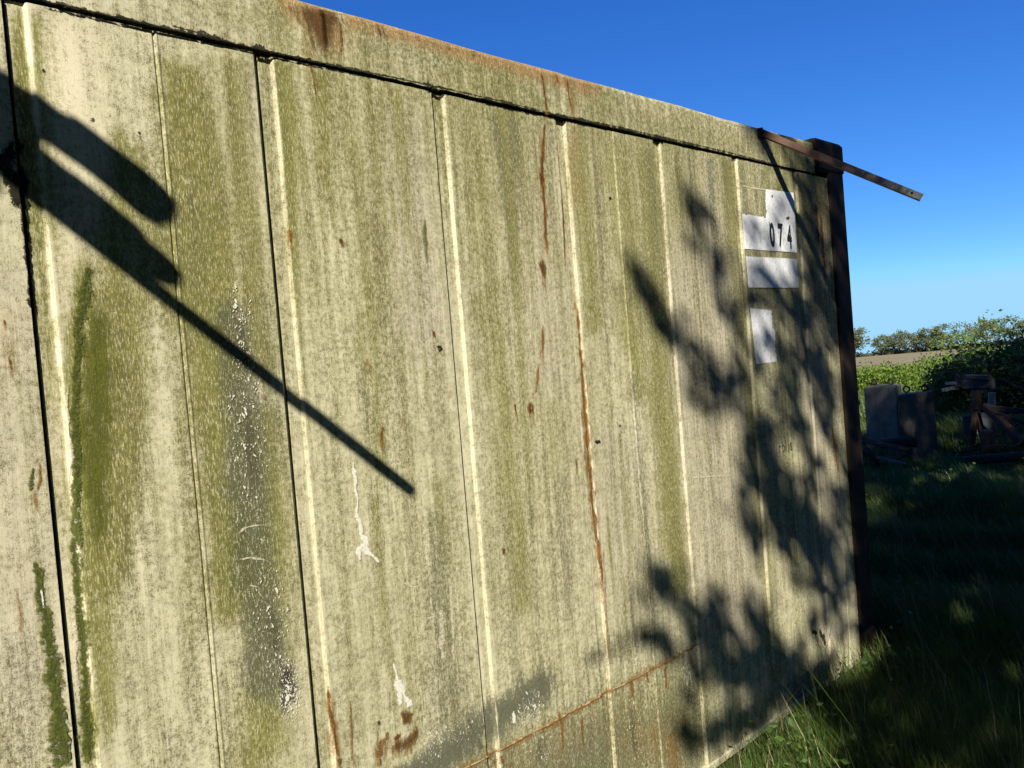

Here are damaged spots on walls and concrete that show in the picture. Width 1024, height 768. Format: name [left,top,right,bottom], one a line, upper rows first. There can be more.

rust [290,4,343,53]
rust [539,74,566,287]
water stain [73,309,117,545]
rust [574,302,606,600]
rust [375,710,418,766]
rust [575,654,680,743]